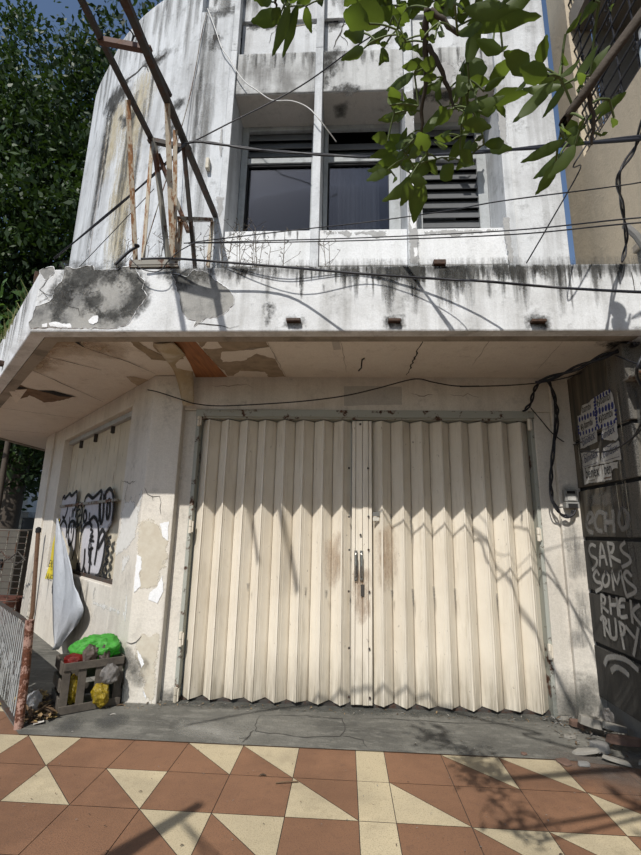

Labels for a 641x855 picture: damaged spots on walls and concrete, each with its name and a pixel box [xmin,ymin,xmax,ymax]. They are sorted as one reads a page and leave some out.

damp [272,48,359,96]
damp [90,73,154,268]
peeling [29,261,150,329]
peeling [167,268,236,328]
damp [164,251,641,304]
peeling [131,342,170,361]
peeling [198,342,286,377]
peeling [115,490,169,603]